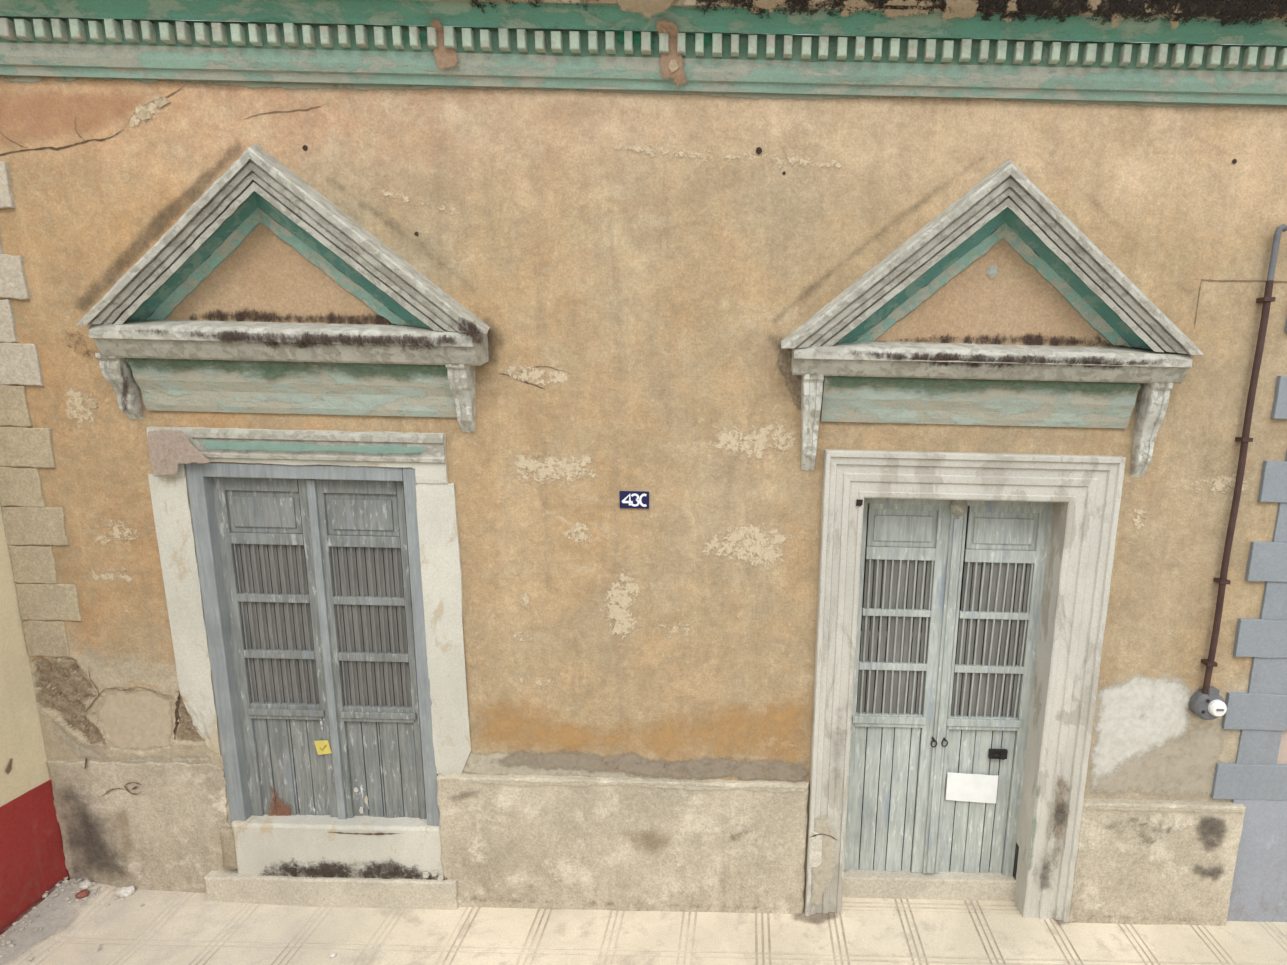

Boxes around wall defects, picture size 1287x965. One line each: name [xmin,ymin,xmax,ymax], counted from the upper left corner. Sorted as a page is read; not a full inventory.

flaking render [429,19,458,69]
flaking render [617,0,687,88]
crack [0,85,184,155]
crack [242,104,325,120]
peeling [508,451,595,486]
peeling [702,521,800,569]
peeling [599,569,697,640]
flaking render [36,660,203,750]
peeling [1095,724,1228,797]
corrosion [268,789,291,816]
damp [1198,818,1225,848]
damp [1196,866,1222,879]